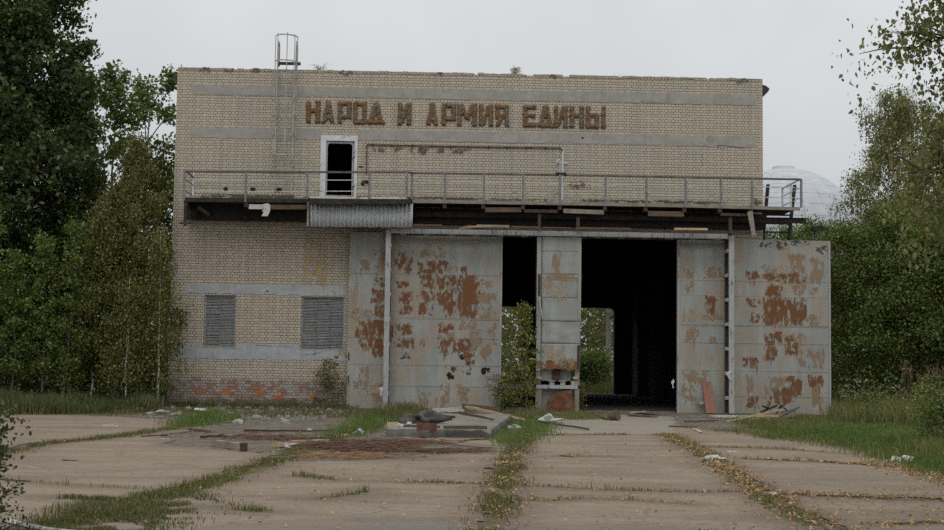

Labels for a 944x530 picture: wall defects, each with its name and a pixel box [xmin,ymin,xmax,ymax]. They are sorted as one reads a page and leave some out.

rust [352,247,497,404]
rust [523,345,579,384]
rust [541,253,578,301]
rust [683,266,725,344]
rust [742,253,825,410]